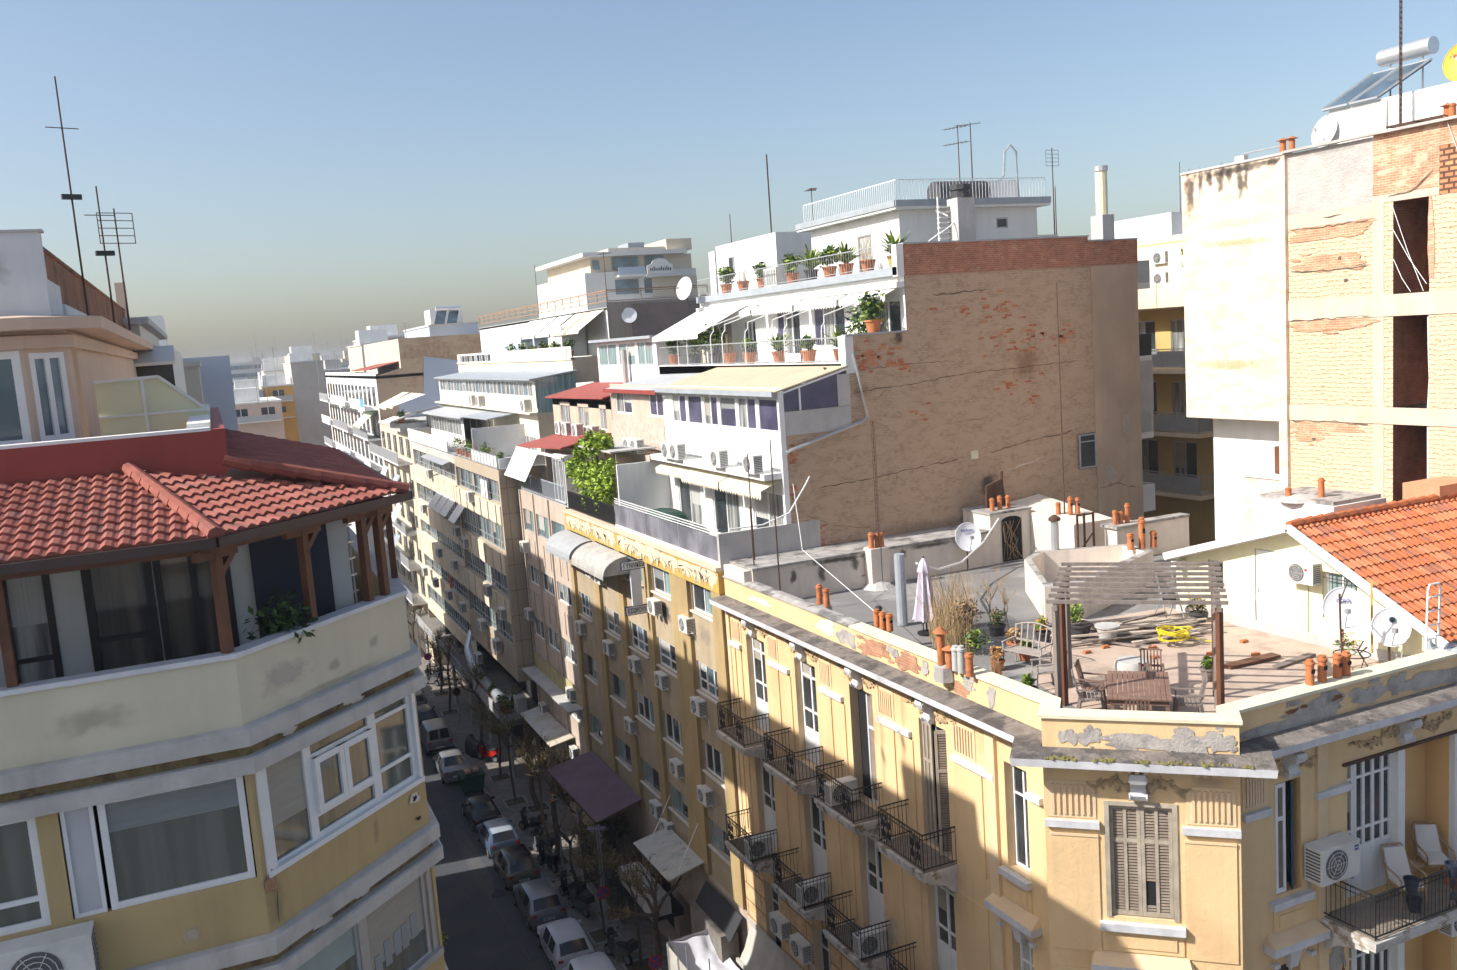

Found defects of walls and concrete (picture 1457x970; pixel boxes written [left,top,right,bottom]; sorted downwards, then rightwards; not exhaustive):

water stain [1186,159,1278,204]
spalling [1289,218,1377,282]
crack [859,360,1077,398]
spalling [1057,667,1457,753]